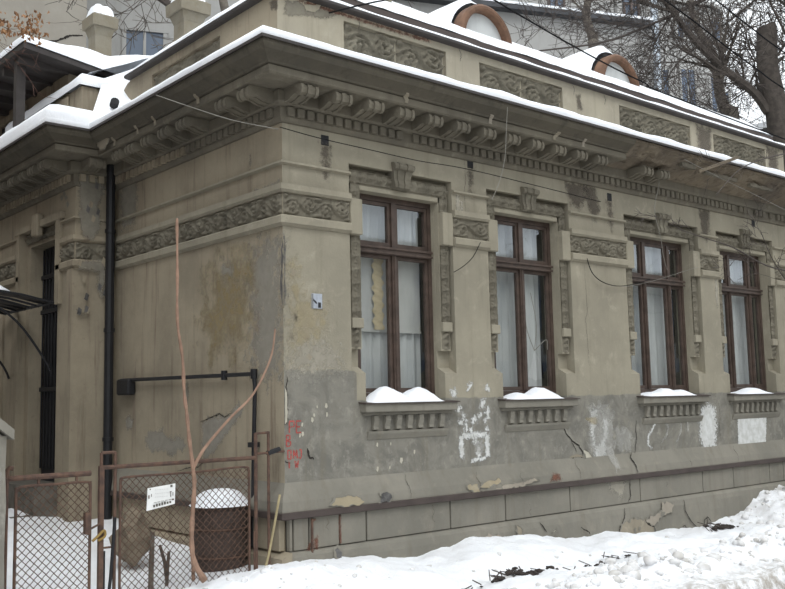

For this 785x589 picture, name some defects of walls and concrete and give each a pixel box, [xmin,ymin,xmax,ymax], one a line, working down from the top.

leakage [201,234,289,386]
crack [564,429,593,478]